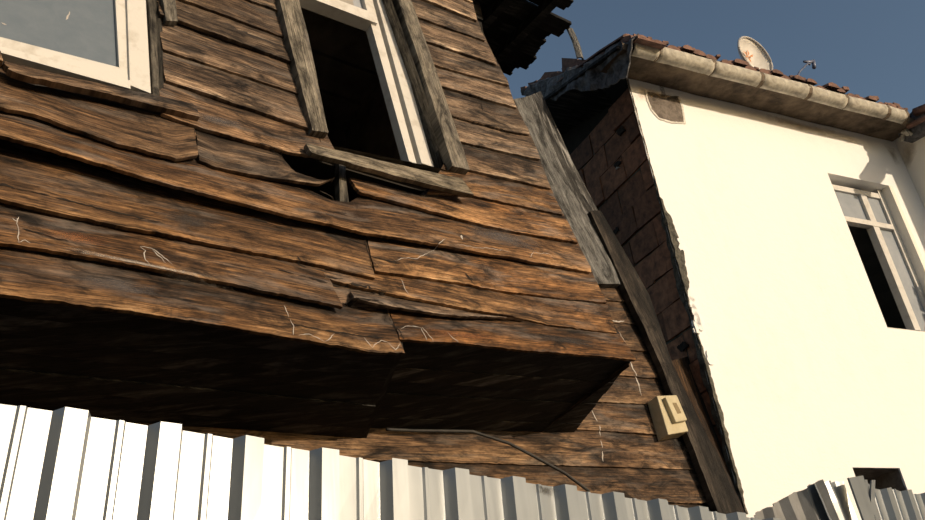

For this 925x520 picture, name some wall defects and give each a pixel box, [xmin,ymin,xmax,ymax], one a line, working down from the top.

crack [280,232,405,342]
spalling [627,79,748,514]